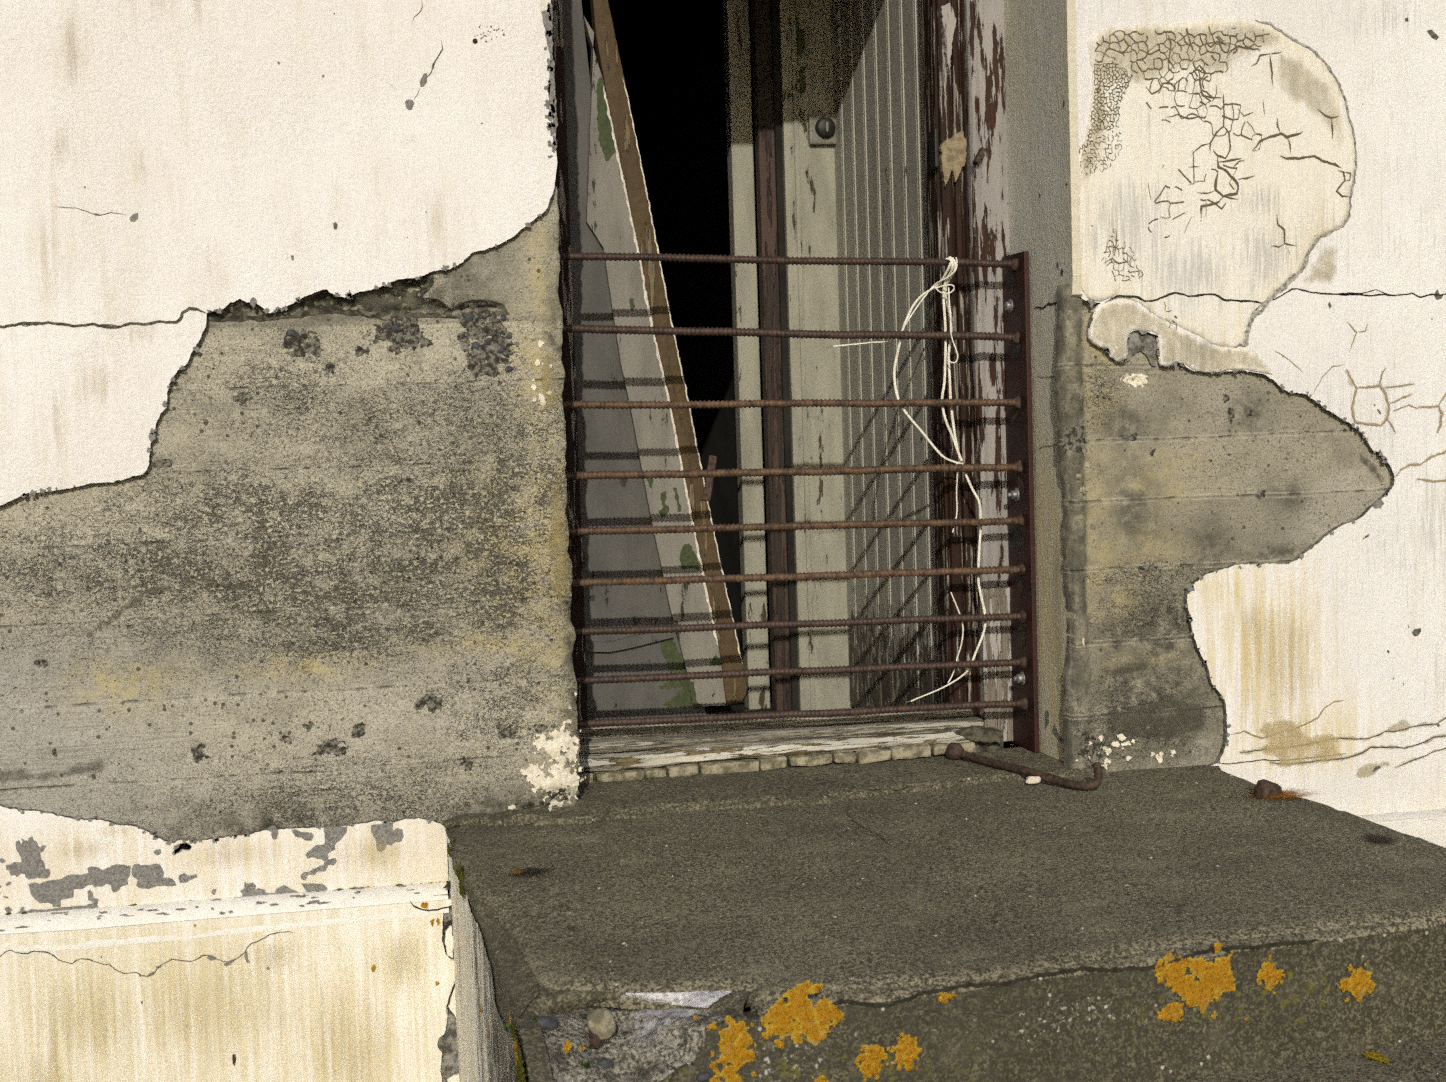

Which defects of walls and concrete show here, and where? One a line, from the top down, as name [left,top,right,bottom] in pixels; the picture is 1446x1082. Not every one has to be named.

crack [0,307,206,329]
crack [1106,288,1446,482]
spalling [0,184,586,931]
spalling [1045,262,1392,772]
crack [1221,700,1446,777]
crack [0,931,293,977]
crack [831,939,1321,1007]
spalling [516,984,750,1082]